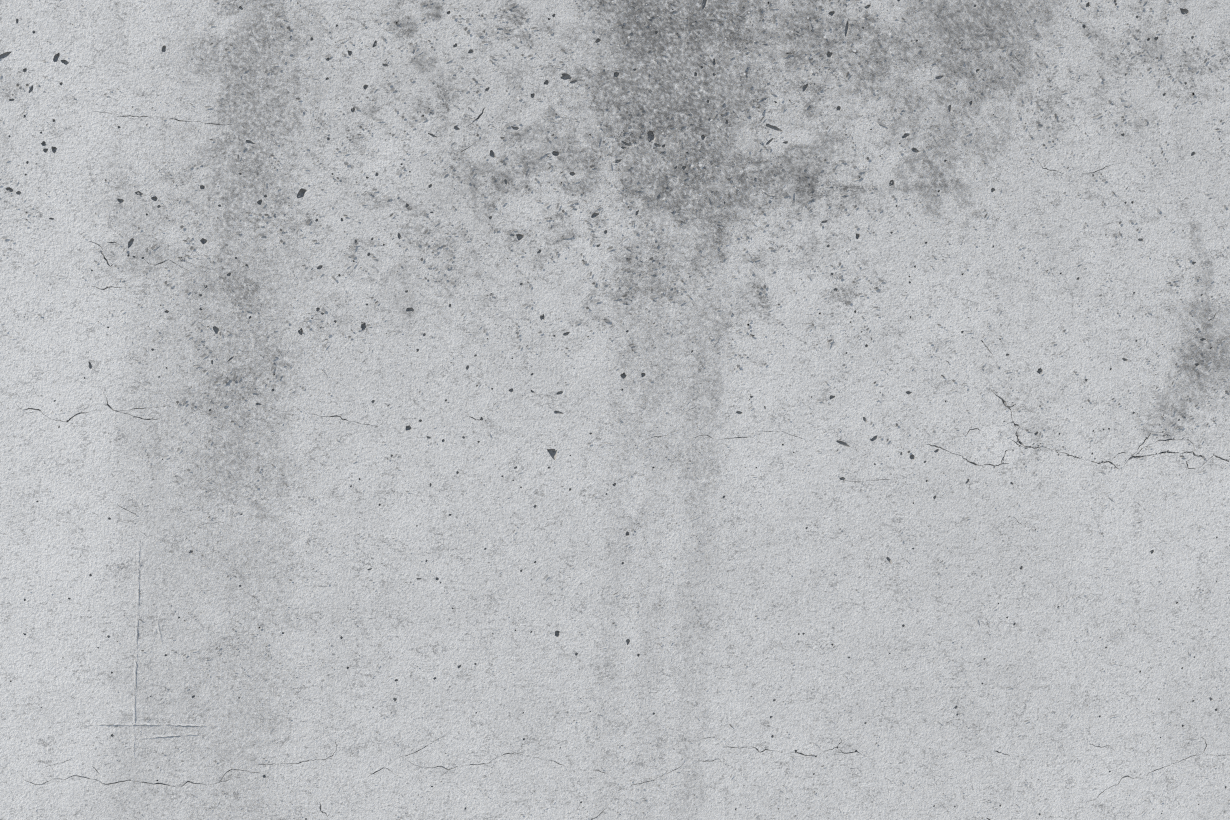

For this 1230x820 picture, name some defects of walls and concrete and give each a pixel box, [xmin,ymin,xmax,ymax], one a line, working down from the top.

damp [592,0,831,227]
crack [927,390,1230,469]